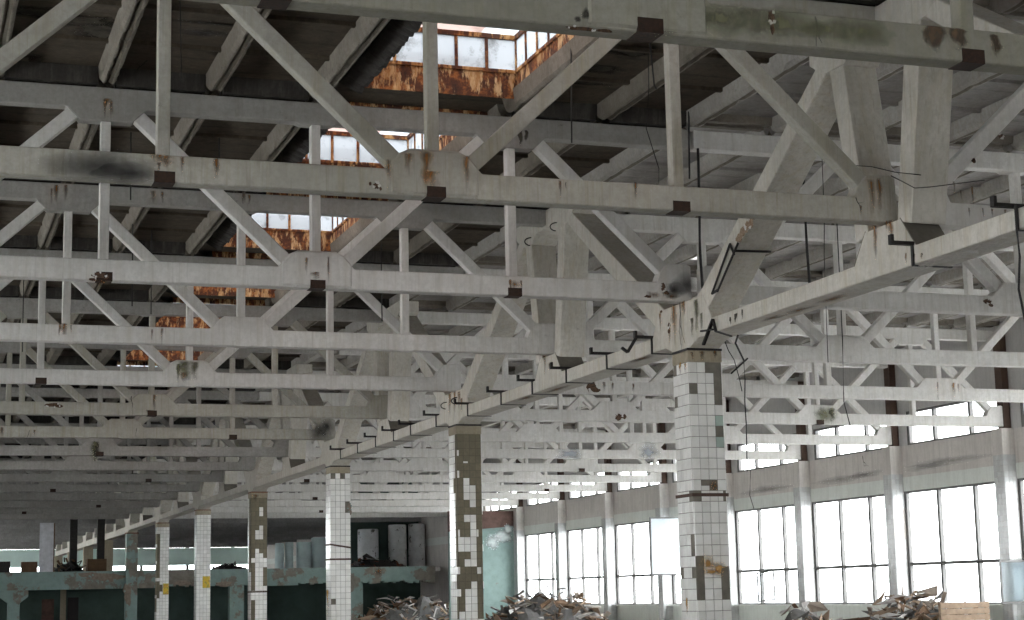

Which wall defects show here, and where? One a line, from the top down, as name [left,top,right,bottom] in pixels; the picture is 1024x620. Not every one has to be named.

corrosion [406,152,435,182]
peeling [78,572,131,606]